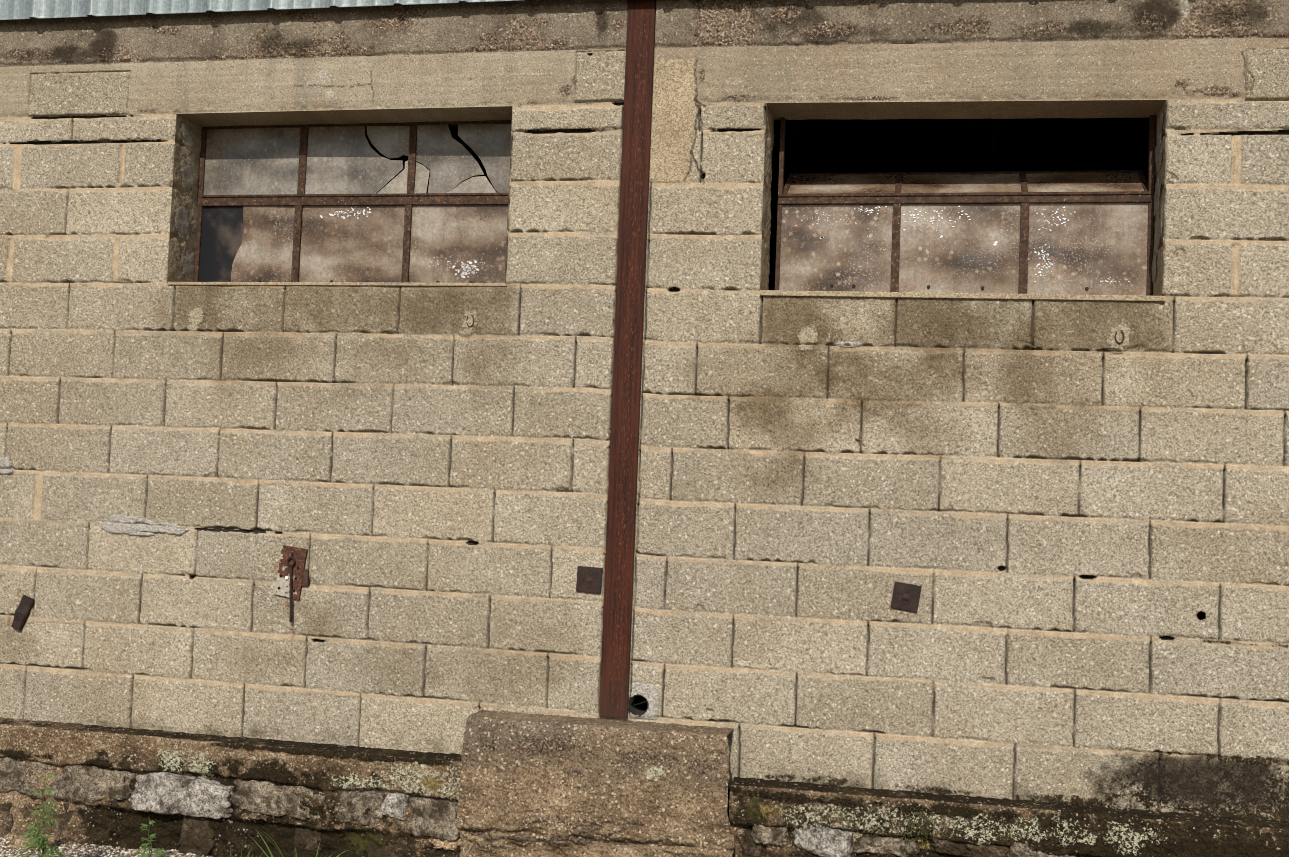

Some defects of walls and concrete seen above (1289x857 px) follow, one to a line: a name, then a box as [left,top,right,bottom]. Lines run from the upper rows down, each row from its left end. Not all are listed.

water stain [27,29,117,63]
water stain [260,29,314,55]
crack [683,0,706,185]
water stain [757,774,862,787]
water stain [895,785,973,795]
water stain [1015,751,1289,822]